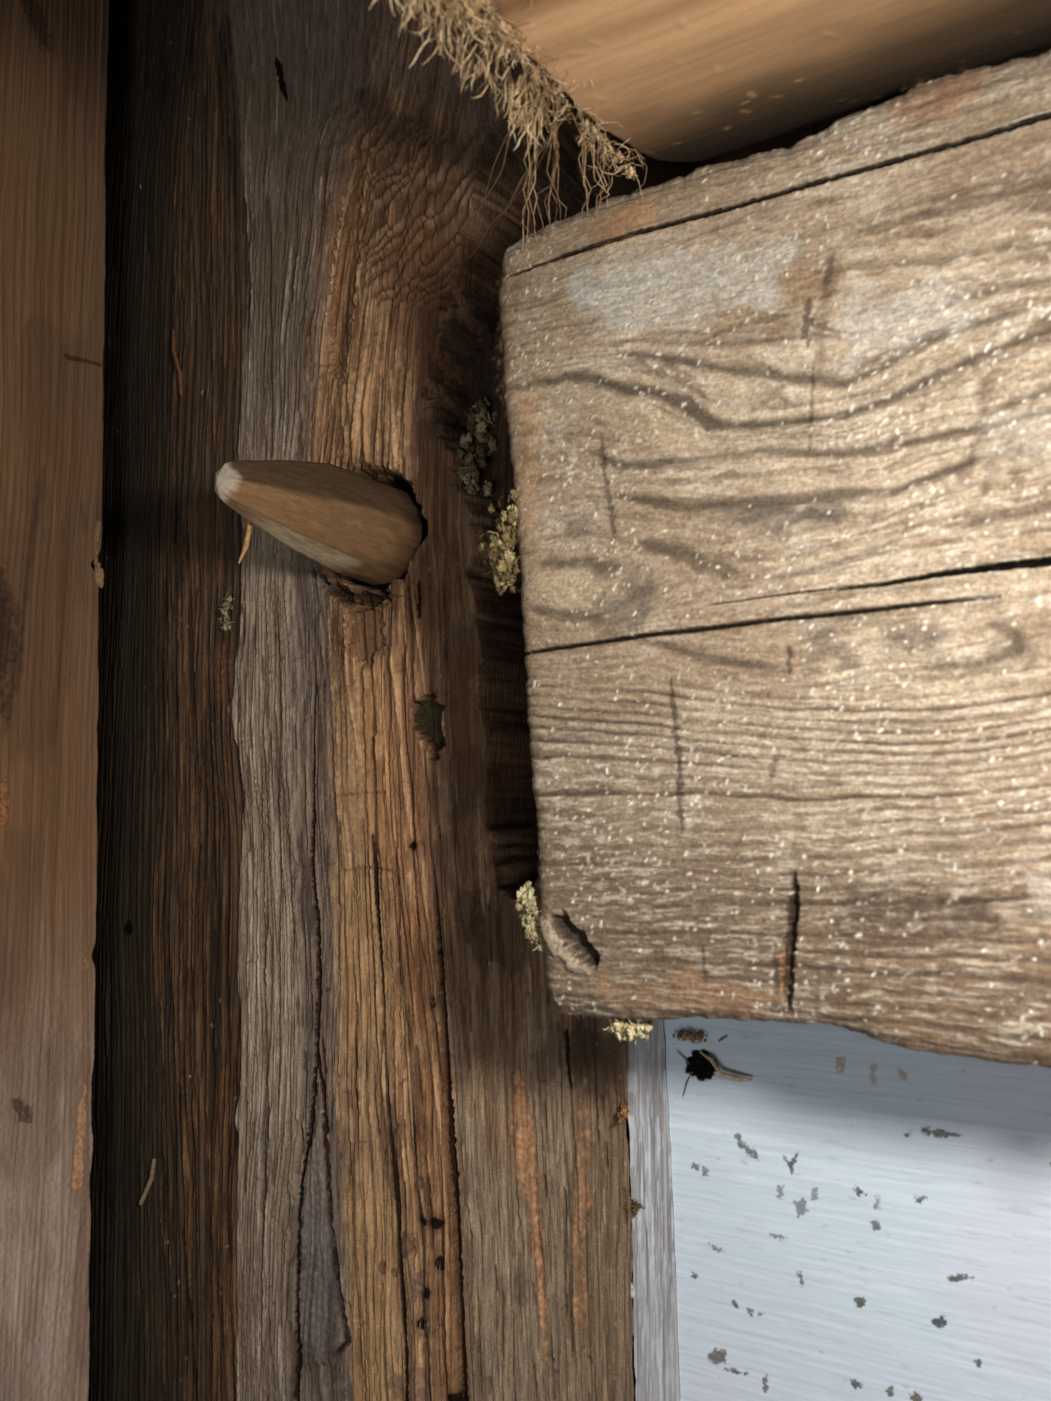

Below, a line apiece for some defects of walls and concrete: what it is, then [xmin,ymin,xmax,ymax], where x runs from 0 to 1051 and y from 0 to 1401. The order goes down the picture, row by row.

crack [513,112,1051,277]
crack [527,556,1051,654]
peeling [904,1127,961,1138]
peeling [734,1133,758,1159]
peeling [777,1154,817,1218]
peeling [856,1187,880,1231]
peeling [932,1316,947,1328]
peeling [708,1349,747,1375]
peeling [886,1386,922,1401]